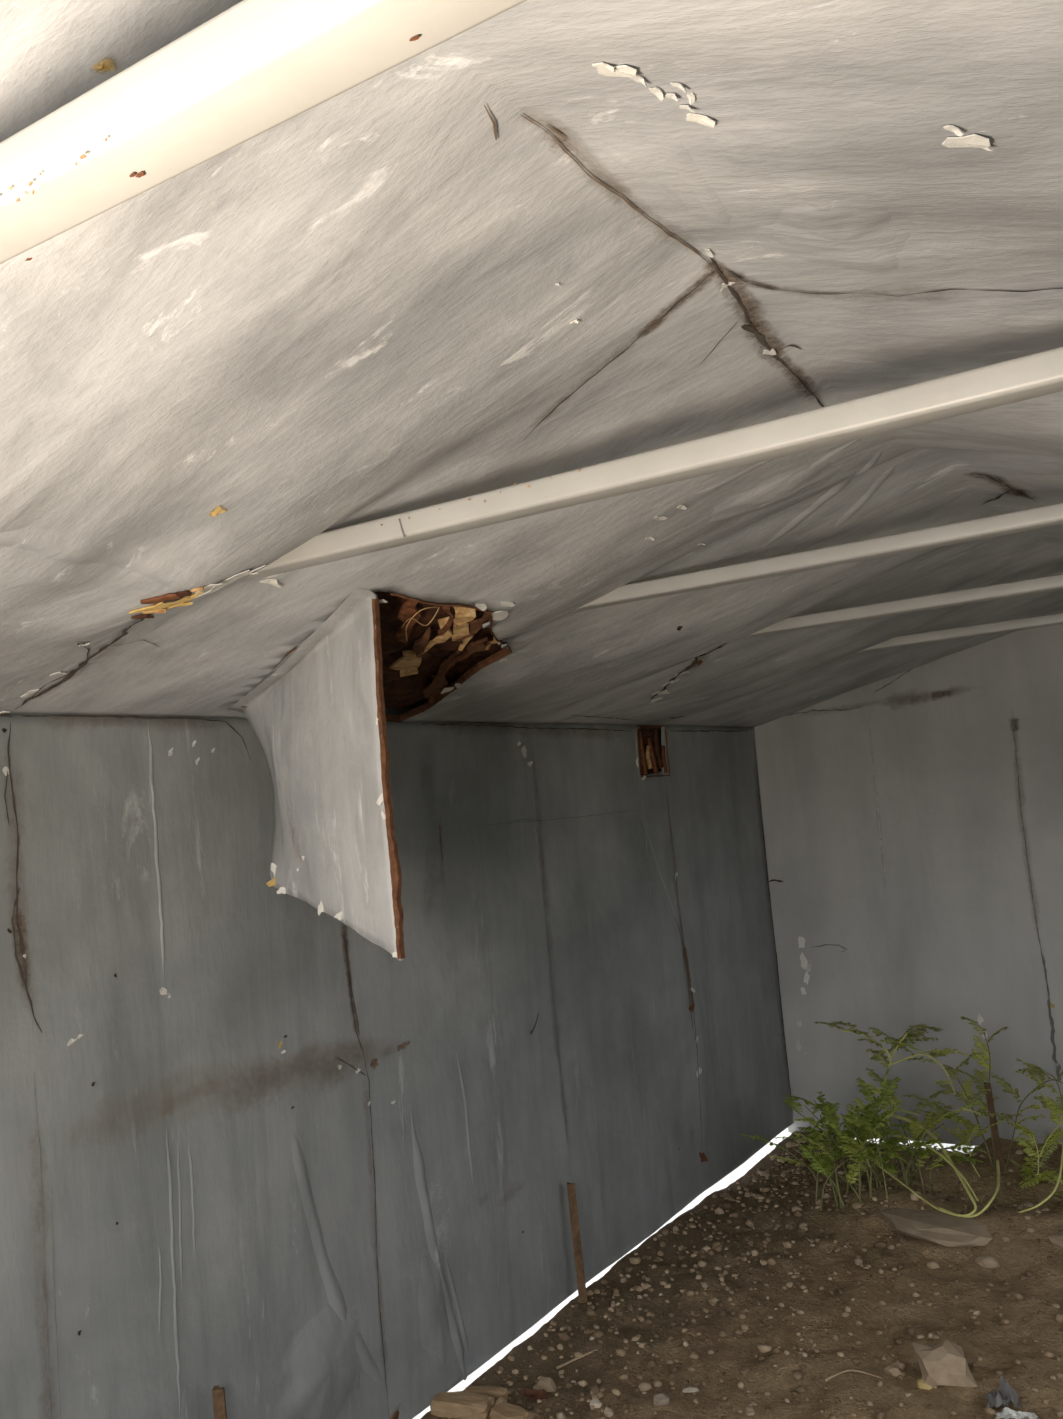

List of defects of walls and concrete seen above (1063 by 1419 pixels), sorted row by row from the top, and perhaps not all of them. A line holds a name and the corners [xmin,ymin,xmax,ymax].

crack [484,105,1063,435]
spalling [129,565,286,619]
peeling [475,602,515,621]
spalling [636,716,683,780]
crack [0,599,252,1032]
peeling [266,862,286,894]
peeling [318,901,343,920]
crack [1012,714,1061,1081]